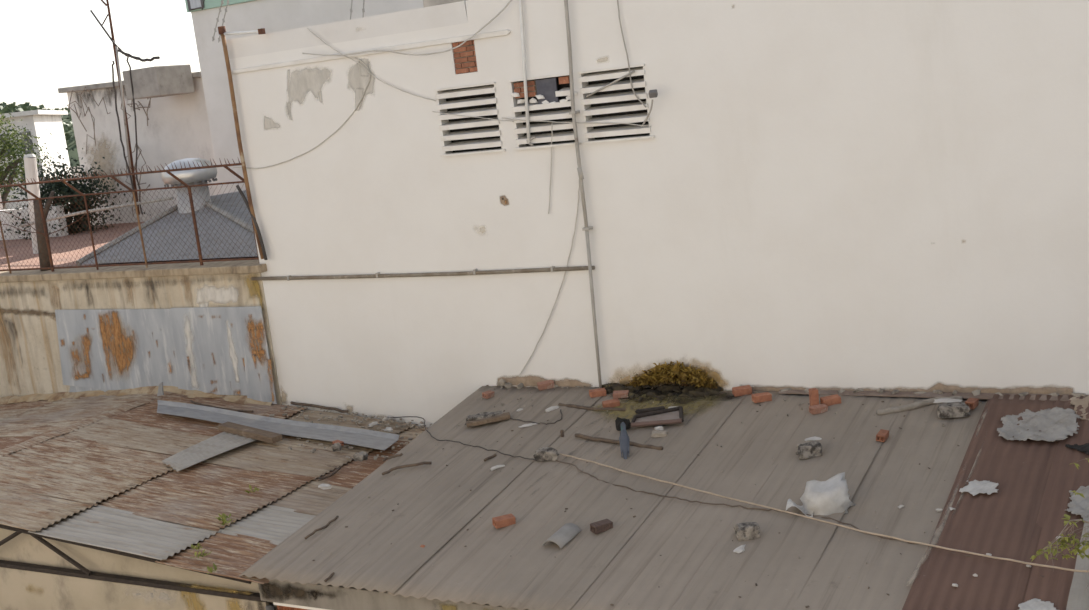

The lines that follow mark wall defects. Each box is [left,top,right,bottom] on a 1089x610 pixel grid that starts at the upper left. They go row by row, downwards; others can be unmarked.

peeling [287,69,330,119]
peeling [348,59,374,110]
peeling [264,117,279,129]
corrosion [61,312,134,380]
corrosion [243,315,274,401]